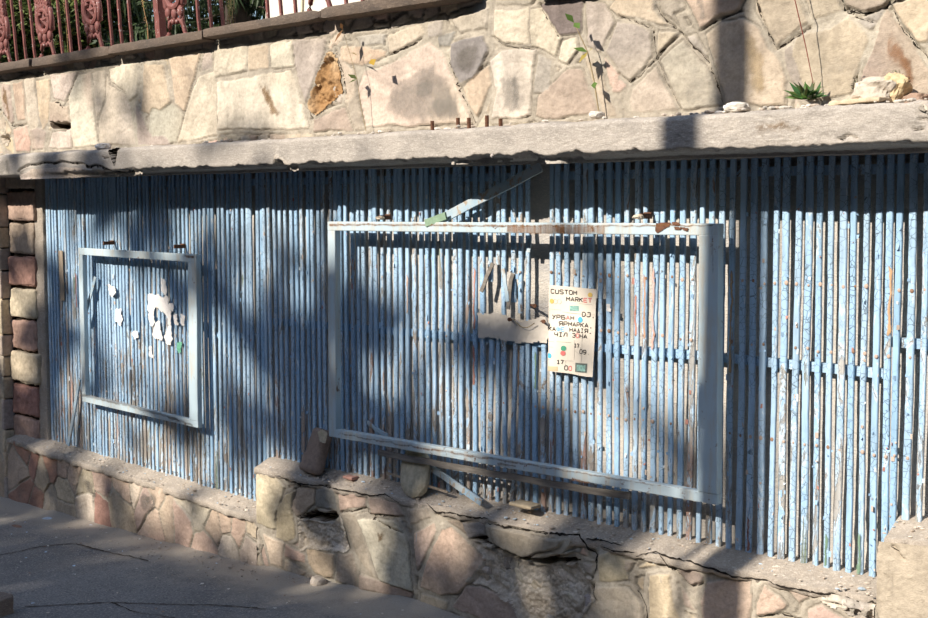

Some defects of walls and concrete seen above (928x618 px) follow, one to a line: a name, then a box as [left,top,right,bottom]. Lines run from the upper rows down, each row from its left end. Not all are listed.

peeling [20,147,142,179]
rust [609,222,700,233]
peeling [887,267,926,336]
peeling [724,263,868,388]
peeling [57,382,255,496]
peeling [729,423,840,457]
peeling [860,439,910,472]
peeling [824,528,885,574]